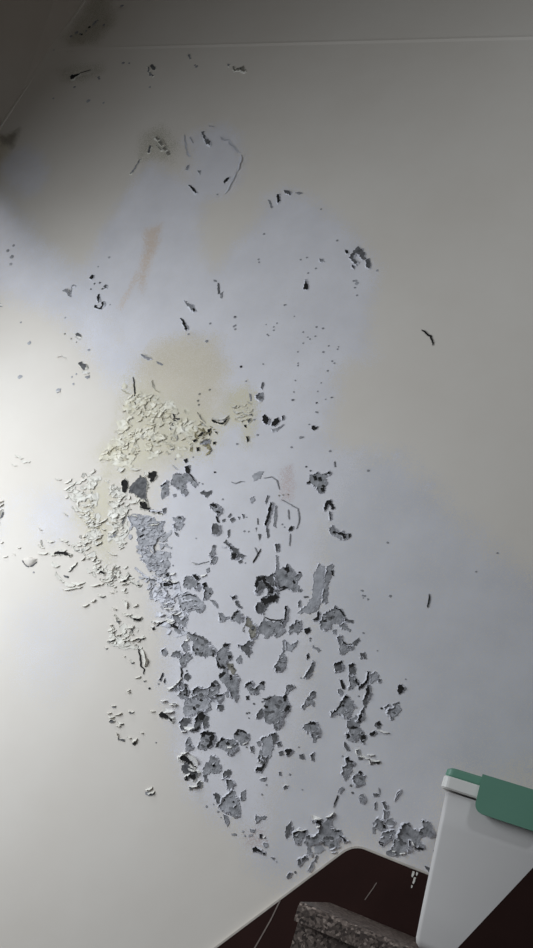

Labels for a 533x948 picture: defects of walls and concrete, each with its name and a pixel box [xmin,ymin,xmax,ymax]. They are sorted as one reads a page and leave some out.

damp [69,328,263,568]
flaking render [37,118,436,879]